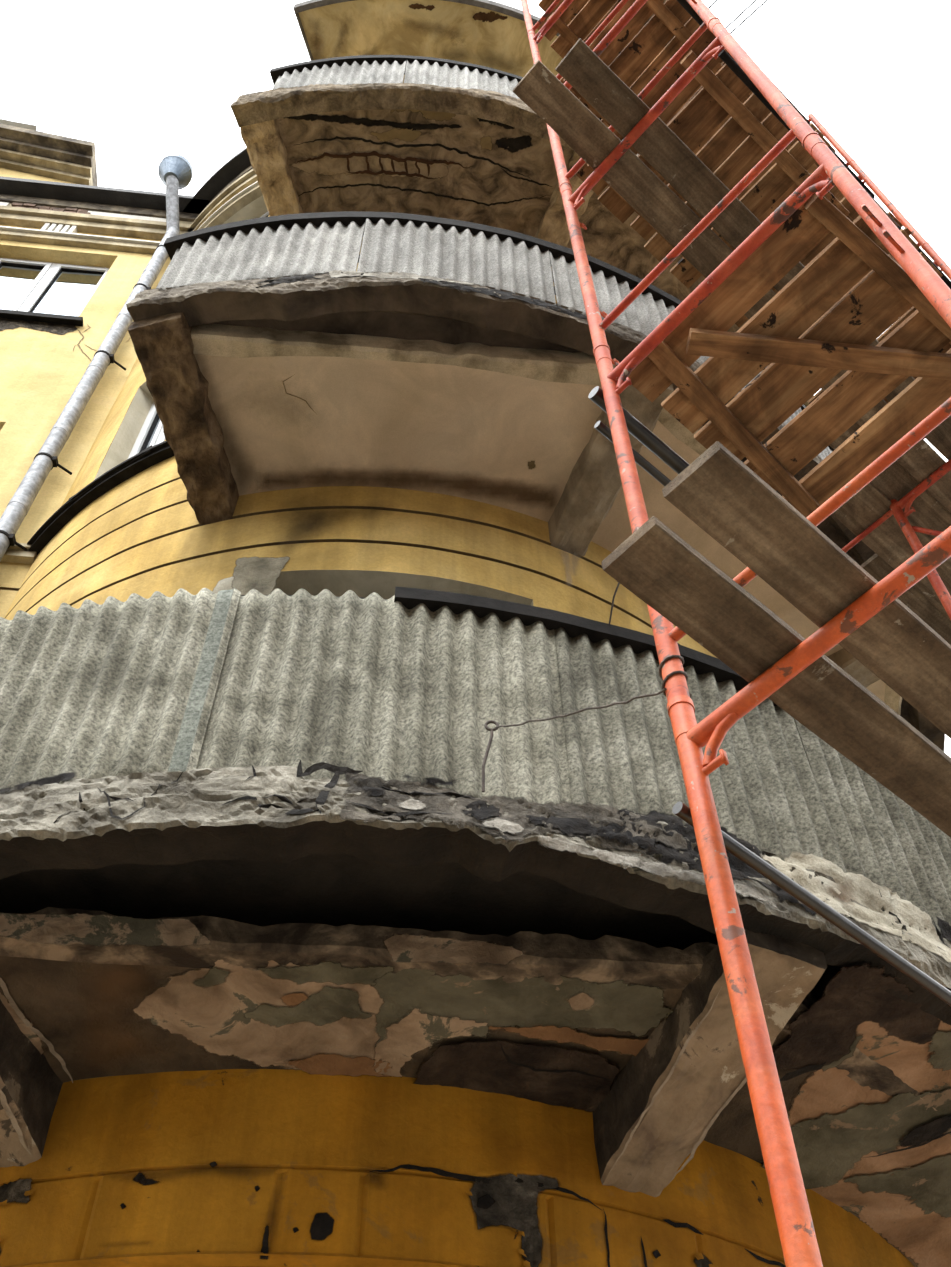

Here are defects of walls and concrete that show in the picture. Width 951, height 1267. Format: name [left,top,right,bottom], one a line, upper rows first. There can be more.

crack [73,324,97,361]
spalling [0,772,76,793]
spalling [340,720,706,884]
spalling [720,827,817,916]
spalling [936,916,951,941]
spalling [773,964,941,1081]
spalling [899,1116,951,1147]
peeling [0,1175,34,1206]
crack [370,1164,610,1267]
peeling [465,1169,559,1267]
crack [641,1219,703,1267]
crack [744,1248,786,1267]